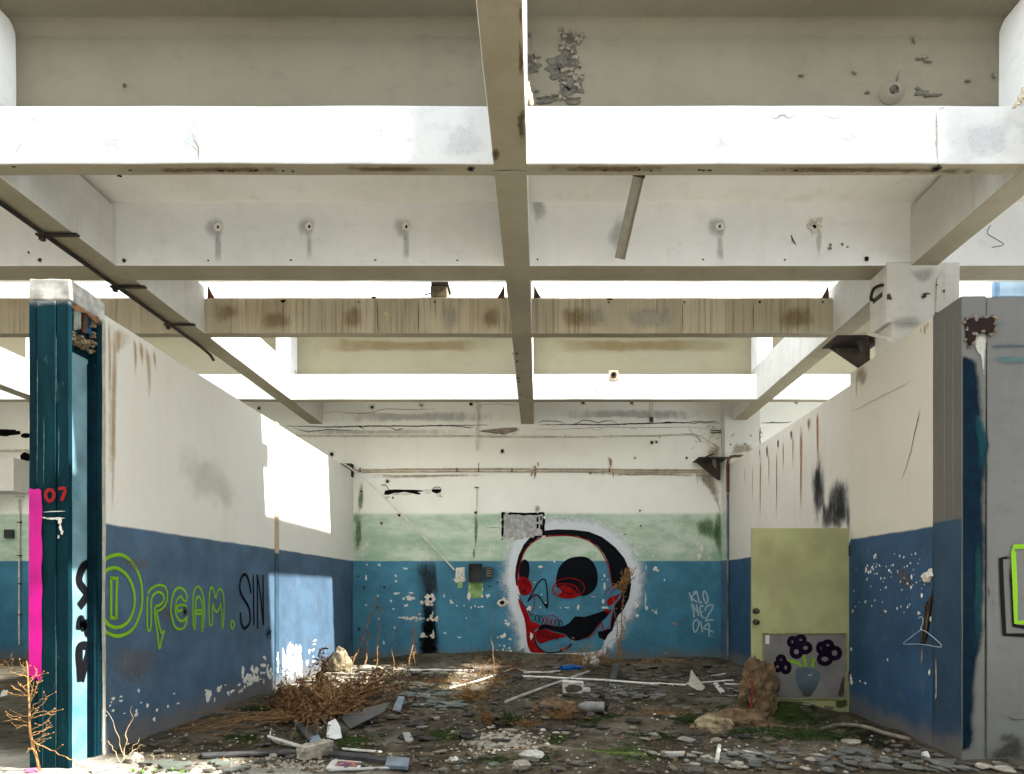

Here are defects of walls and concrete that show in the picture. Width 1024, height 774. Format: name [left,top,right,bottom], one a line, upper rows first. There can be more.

peeling [527,27,585,105]
peeling [915,86,943,97]
corrosion [109,333,119,389]
spalling [962,314,998,372]
corrosion [752,415,818,502]
water stain [699,520,715,536]
peeling [365,567,508,639]
spalling [852,552,934,644]
peeling [205,640,316,702]